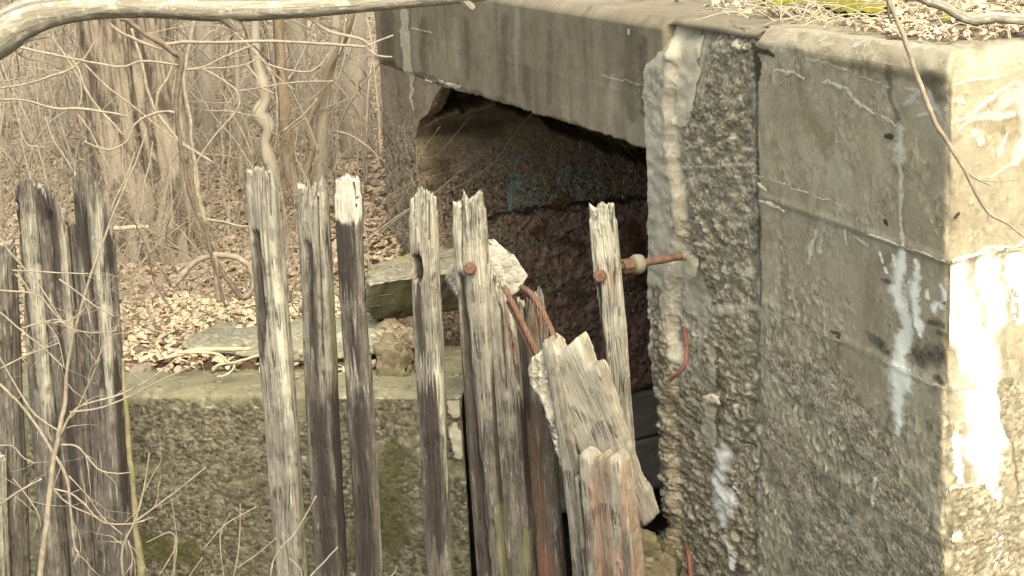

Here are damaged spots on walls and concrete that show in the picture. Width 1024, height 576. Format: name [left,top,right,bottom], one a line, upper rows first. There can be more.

spalling [507,207,604,361]
corrosion [627,221,645,255]
corrosion [635,269,647,286]
leakage [705,347,718,386]
leakage [807,230,823,264]
spalling [614,26,1024,576]
leakage [844,124,1024,502]
leakage [700,404,740,571]